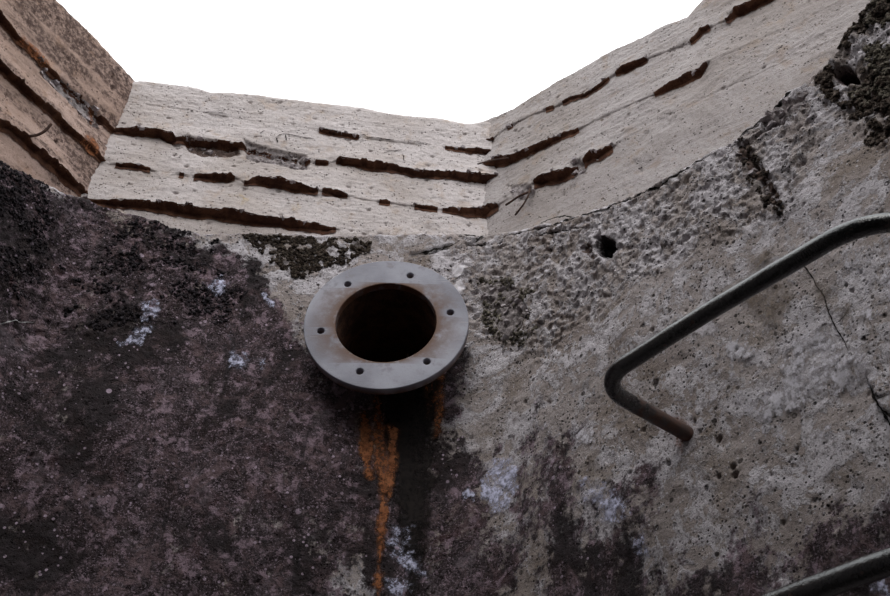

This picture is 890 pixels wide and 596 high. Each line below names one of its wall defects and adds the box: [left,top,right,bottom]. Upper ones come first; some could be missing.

spalling [38,56,100,129]
spalling [185,135,309,170]
spalling [572,156,586,175]
crack [804,267,852,355]
crack [865,375,890,426]
corrosion [359,395,399,594]